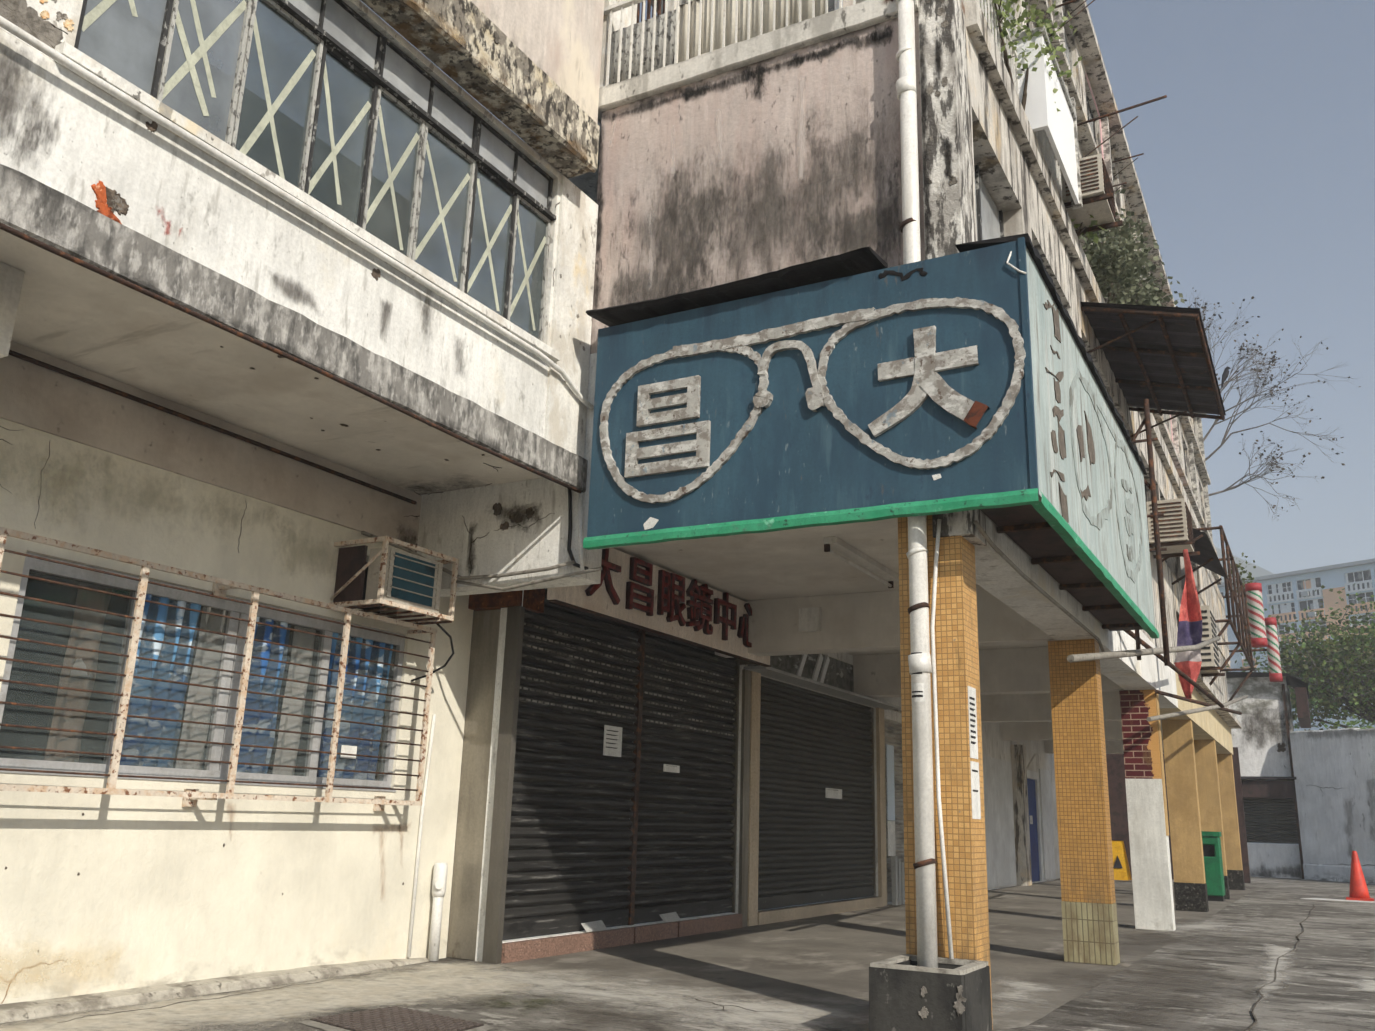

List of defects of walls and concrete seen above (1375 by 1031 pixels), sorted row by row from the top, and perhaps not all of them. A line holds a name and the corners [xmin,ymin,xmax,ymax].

peeling [0,0,74,49]
leakage [0,50,38,133]
leakage [596,27,898,307]
leakage [919,24,941,252]
leakage [944,138,952,180]
spalling [91,181,129,224]
leakage [274,276,313,305]
leakage [382,302,390,331]
crack [0,442,50,529]
crack [1245,905,1315,1031]
spalling [918,986,929,1019]
spalling [953,985,967,1016]